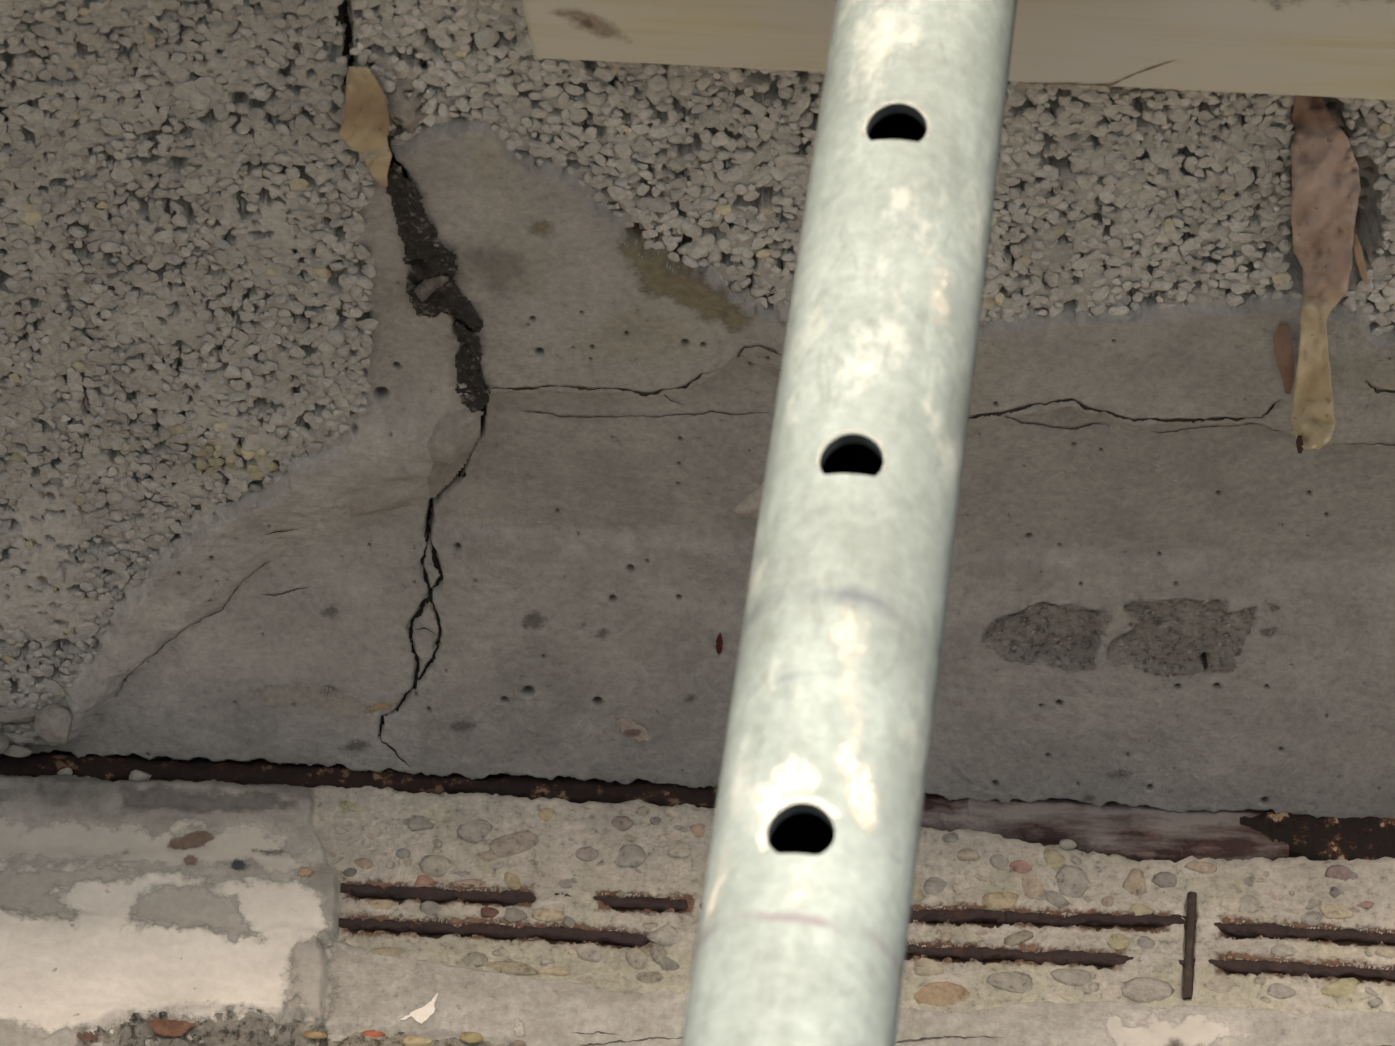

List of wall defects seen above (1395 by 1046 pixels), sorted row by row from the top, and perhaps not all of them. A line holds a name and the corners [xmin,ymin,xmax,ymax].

crack [334,0,354,87]
crack [968,398,1280,434]
crack [378,370,769,767]
leakage [120,783,295,812]
corrosion [0,753,717,808]
corrosion [921,792,1395,862]
leakage [167,831,214,865]
leakage [231,849,283,870]
spalling [339,918,650,947]
spalling [905,944,1134,968]
spalling [909,908,1197,931]
corrosion [1215,915,1395,986]